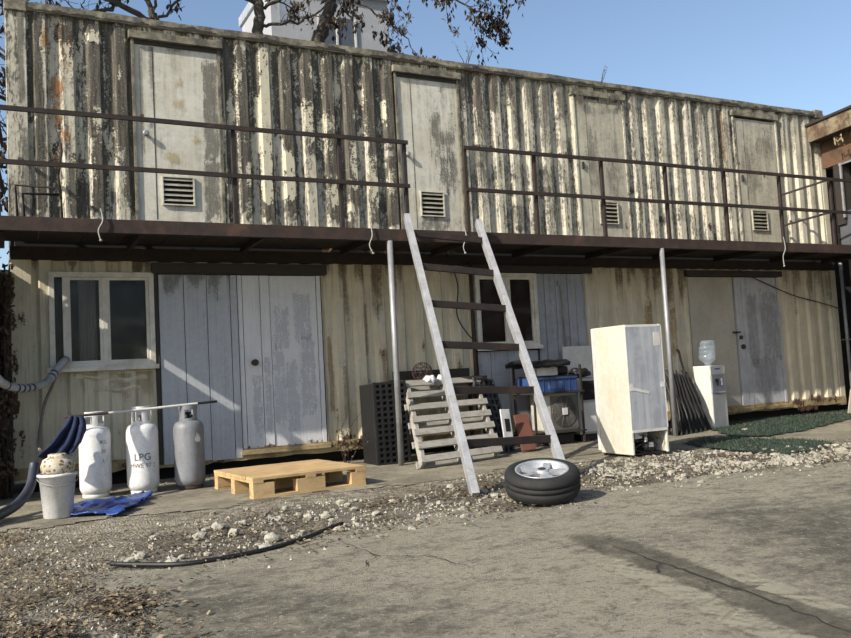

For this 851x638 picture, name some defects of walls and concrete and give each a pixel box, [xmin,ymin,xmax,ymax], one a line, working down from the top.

peeling [39,19,102,84]
peeling [44,91,98,208]
peeling [93,105,117,158]
peeling [226,61,242,131]
peeling [246,47,297,205]
peeling [292,58,334,185]
peeling [327,79,395,216]
leakage [429,106,461,196]
leakage [467,144,488,213]
leakage [451,69,624,151]
leakage [716,110,730,167]